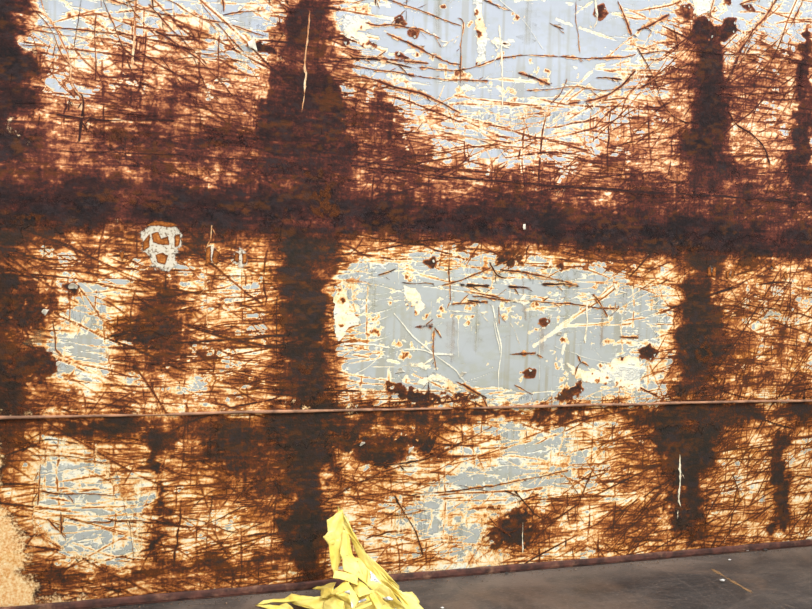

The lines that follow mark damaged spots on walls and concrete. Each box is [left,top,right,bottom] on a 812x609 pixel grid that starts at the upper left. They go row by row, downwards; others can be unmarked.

peeling [394,0,420,39]
peeling [593,3,609,21]
peeling [679,3,737,50]
peeling [245,36,278,57]
rust [0,0,812,247]
peeling [422,256,437,268]
peeling [460,246,533,305]
peeling [638,343,659,362]
rust [0,196,812,605]
peeling [380,368,480,409]
peeling [522,367,537,379]
peeling [554,380,584,405]